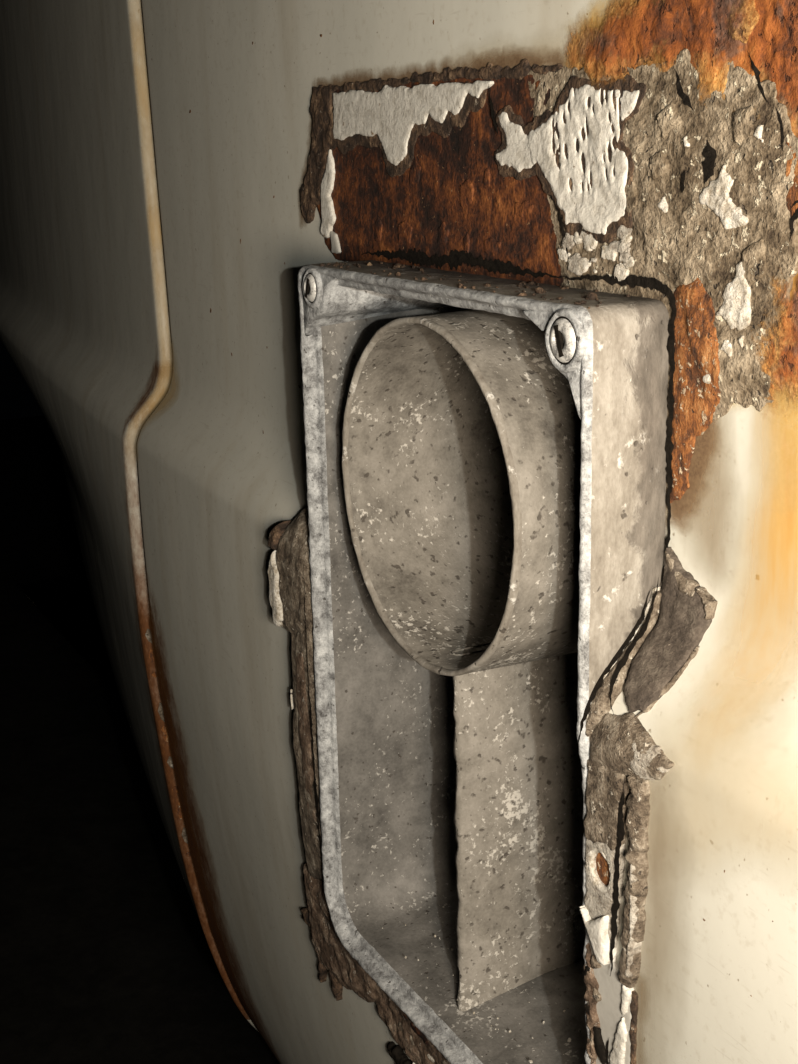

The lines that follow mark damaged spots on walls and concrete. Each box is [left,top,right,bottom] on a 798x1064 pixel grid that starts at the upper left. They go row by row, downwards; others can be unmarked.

peeling [320,80,494,254]
peeling [494,74,646,281]
peeling [658,197,668,213]
peeling [649,101,682,180]
corrosion [566,0,798,217]
peeling [699,165,749,229]
peeling [732,105,764,143]
crack [748,52,785,152]
crack [788,200,798,245]
peeling [716,239,767,357]
corrosion [667,278,721,526]
corrosion [750,268,798,652]